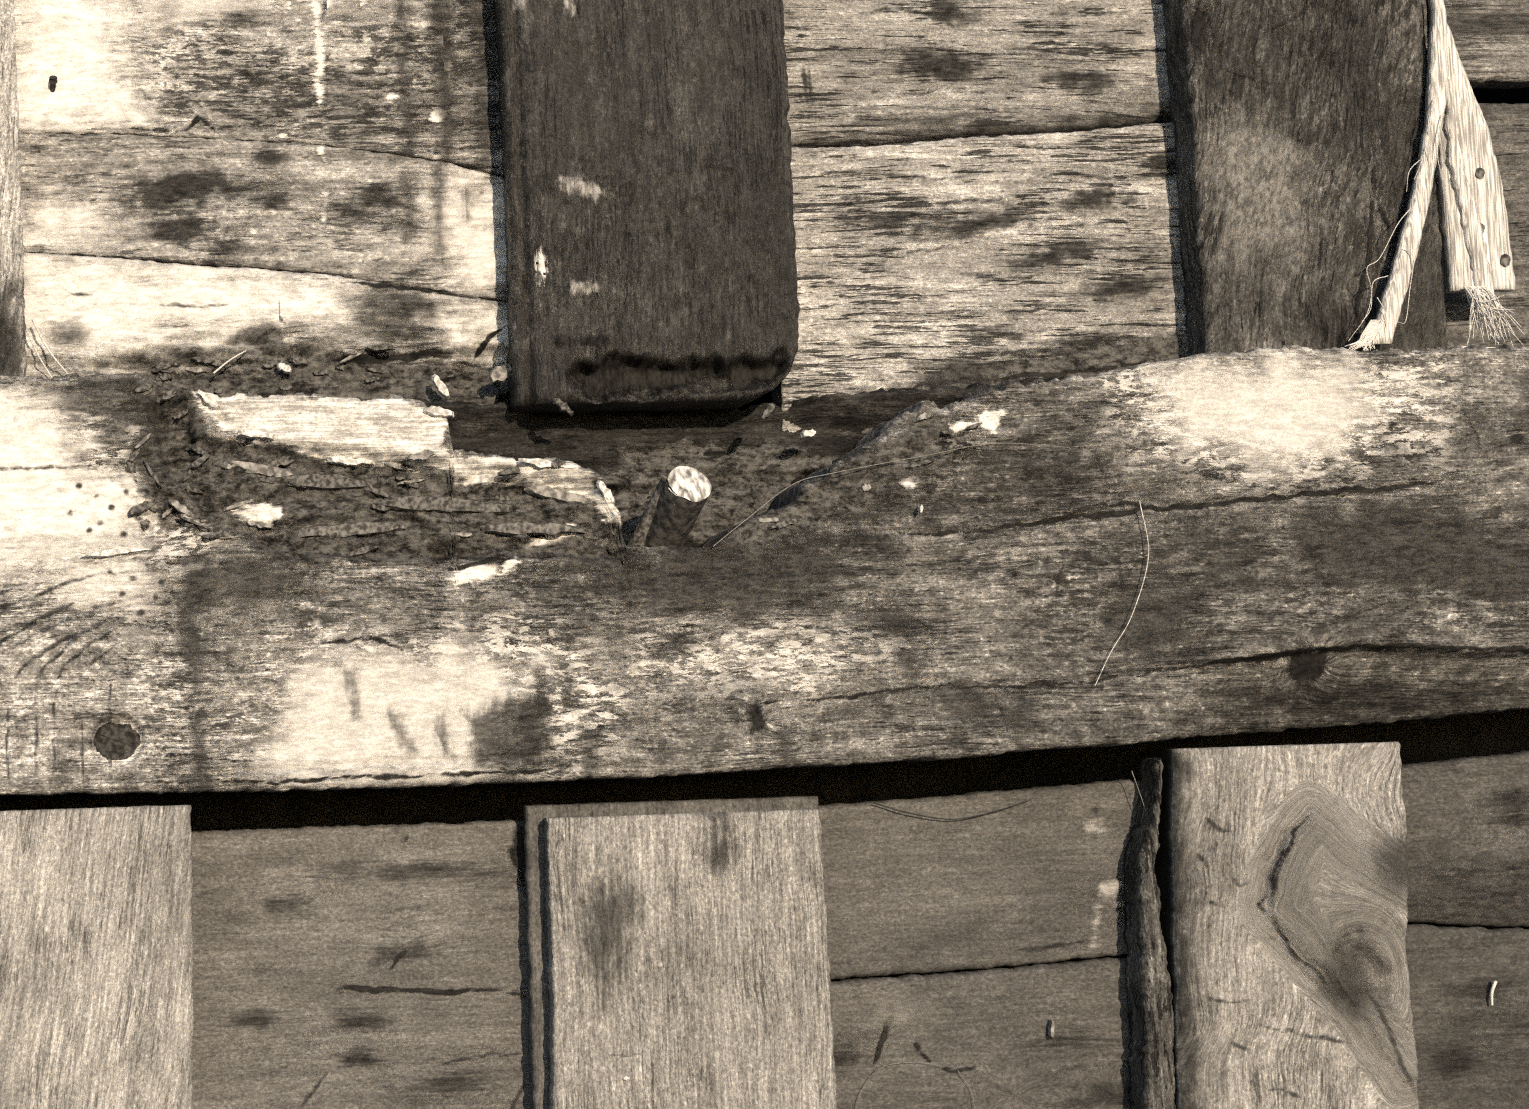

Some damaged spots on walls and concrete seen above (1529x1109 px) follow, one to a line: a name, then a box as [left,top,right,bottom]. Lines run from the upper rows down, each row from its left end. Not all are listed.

leakage [133,0,498,246]
leakage [107,171,292,254]
leakage [227,322,284,359]
spalling [122,287,628,575]
spalling [724,412,982,562]
crack [727,642,1529,740]